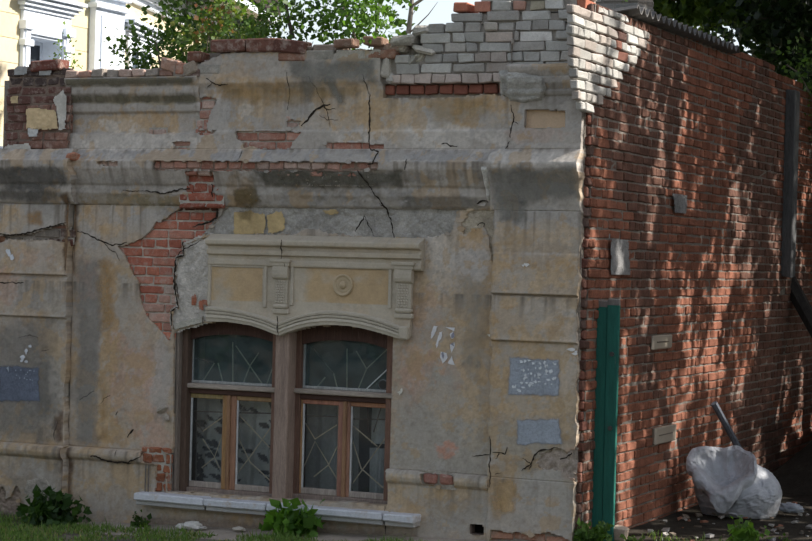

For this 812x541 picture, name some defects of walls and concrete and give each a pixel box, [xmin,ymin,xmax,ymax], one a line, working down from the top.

flaking render [3,64,73,149]
flaking render [196,96,217,135]
flaking render [237,116,301,150]
crack [301,77,335,126]
flaking render [322,140,384,149]
crack [355,77,395,237]
crack [0,222,127,261]
flaking render [120,159,494,340]
crack [90,429,143,464]
flaking render [141,446,173,492]
crack [474,437,572,488]
flaking render [491,530,569,541]